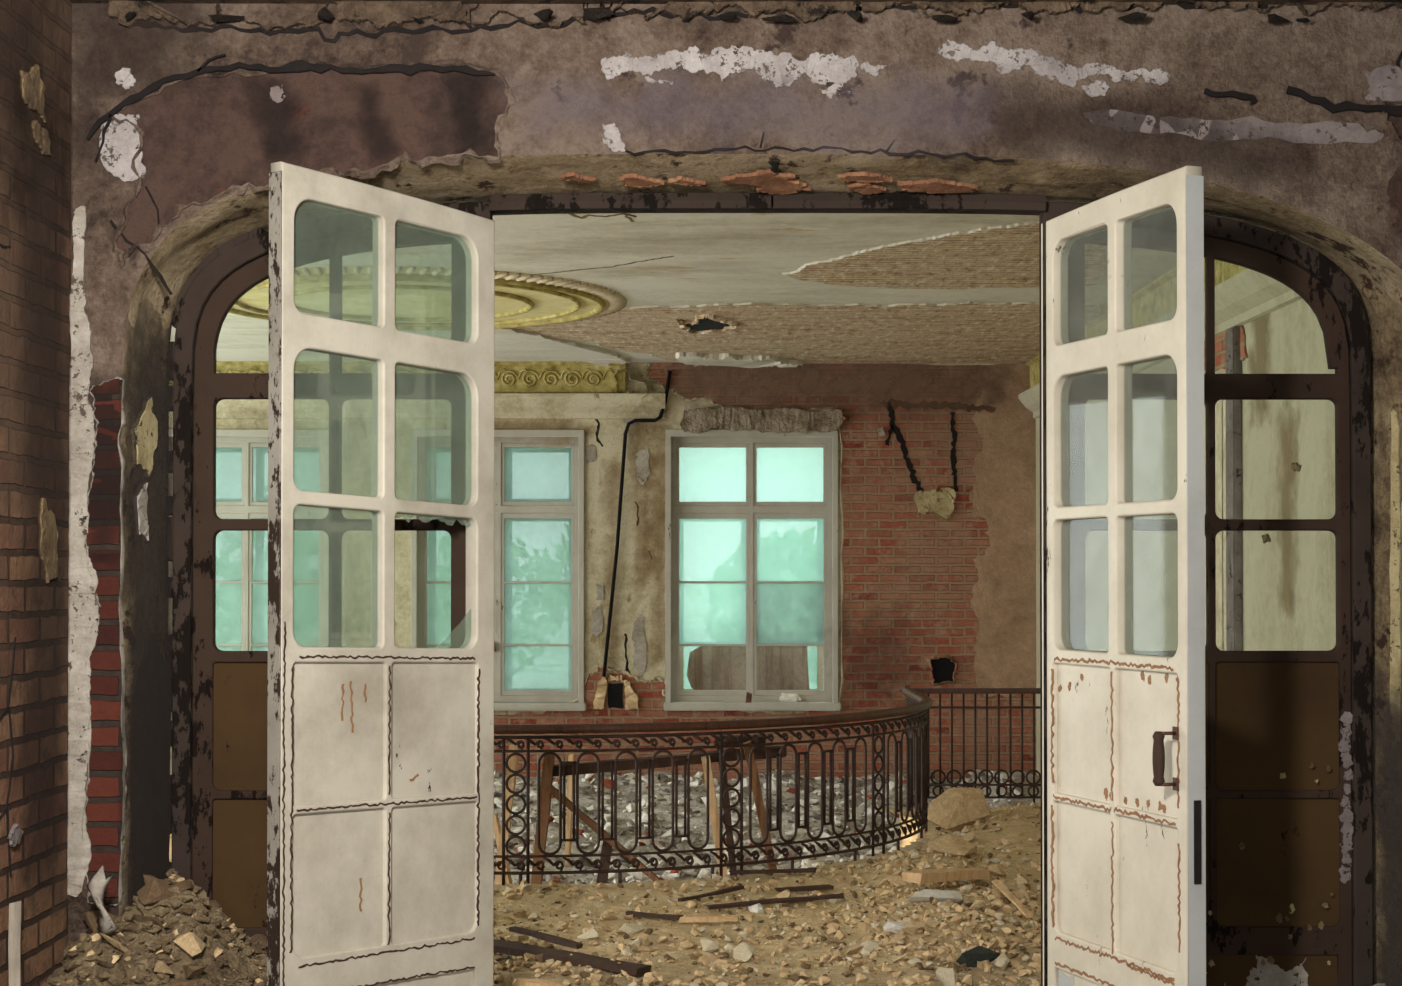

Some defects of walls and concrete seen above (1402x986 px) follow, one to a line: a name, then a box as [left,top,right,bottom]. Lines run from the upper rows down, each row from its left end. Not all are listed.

crack [86,4,769,162]
peeling [600,45,894,99]
crack [827,4,934,15]
crack [968,4,1019,12]
crack [1073,4,1202,14]
flaking render [937,40,1402,217]
crack [1203,86,1402,117]
crack [883,398,996,493]
flaking render [38,206,158,909]
flaking render [282,221,1180,986]
peeling [1389,400,1402,713]
peeling [1275,711,1353,940]